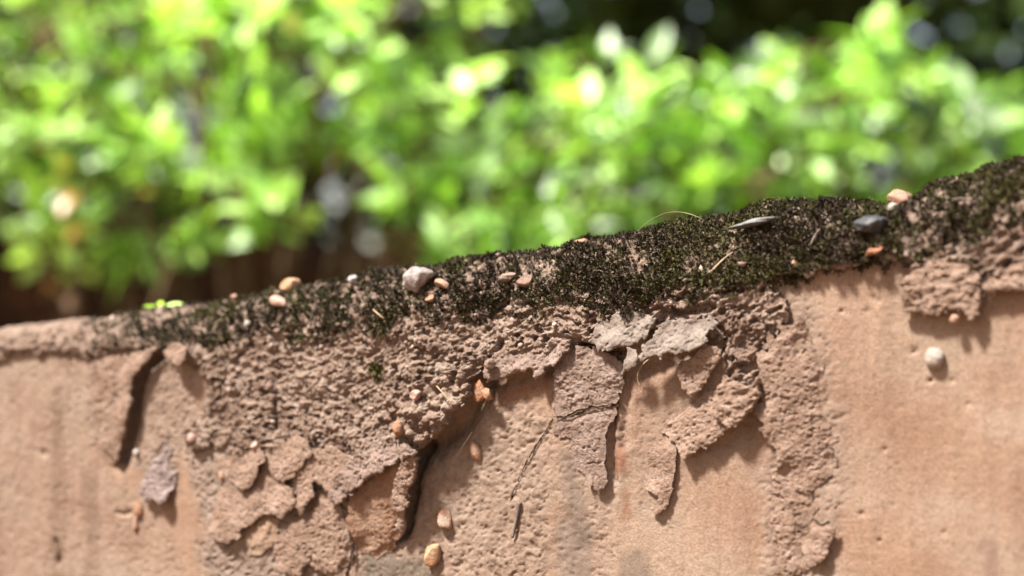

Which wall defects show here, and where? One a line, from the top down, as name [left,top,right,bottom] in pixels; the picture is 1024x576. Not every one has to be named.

peeling [899,254,1024,322]
peeling [208,428,420,576]
crack [510,405,612,501]
peeling [472,310,841,576]